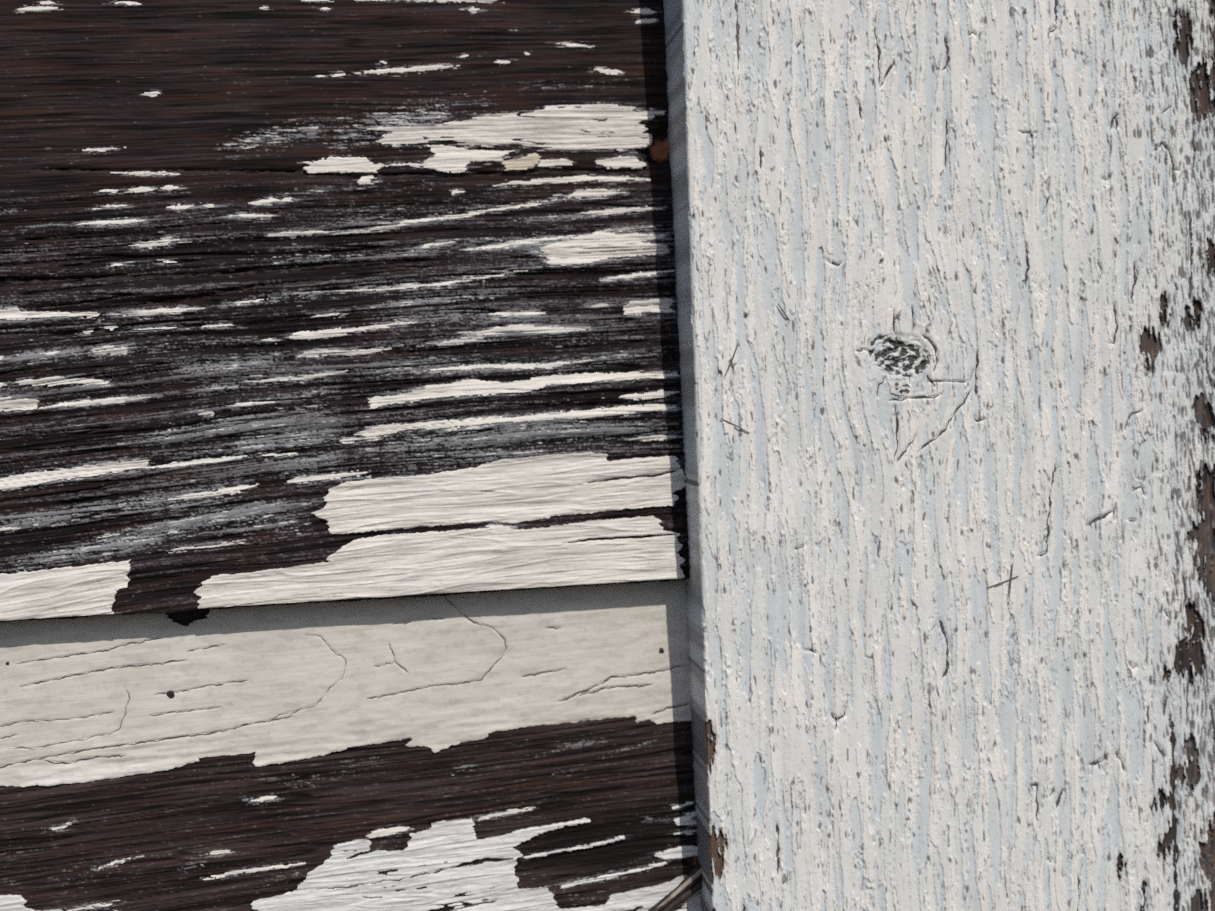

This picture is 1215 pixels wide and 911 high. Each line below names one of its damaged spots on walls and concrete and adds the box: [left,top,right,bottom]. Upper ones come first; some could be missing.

peeling [1171,0,1215,123]
peeling [77,171,215,225]
peeling [267,104,675,292]
peeling [0,377,151,412]
peeling [0,306,205,334]
peeling [253,313,420,383]
peeling [339,360,680,444]
peeling [1139,291,1203,374]
peeling [1162,463,1215,686]
crack [0,634,346,768]
crack [367,596,688,715]
peeling [203,802,728,911]